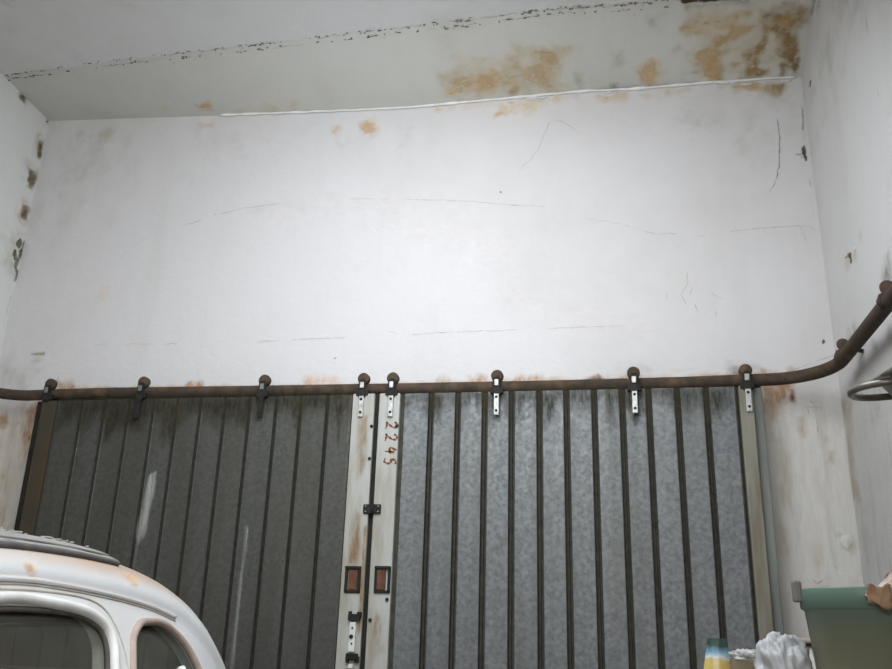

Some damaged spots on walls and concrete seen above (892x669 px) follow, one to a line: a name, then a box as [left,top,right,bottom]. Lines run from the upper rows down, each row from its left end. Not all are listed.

water stain [738,9,804,95]